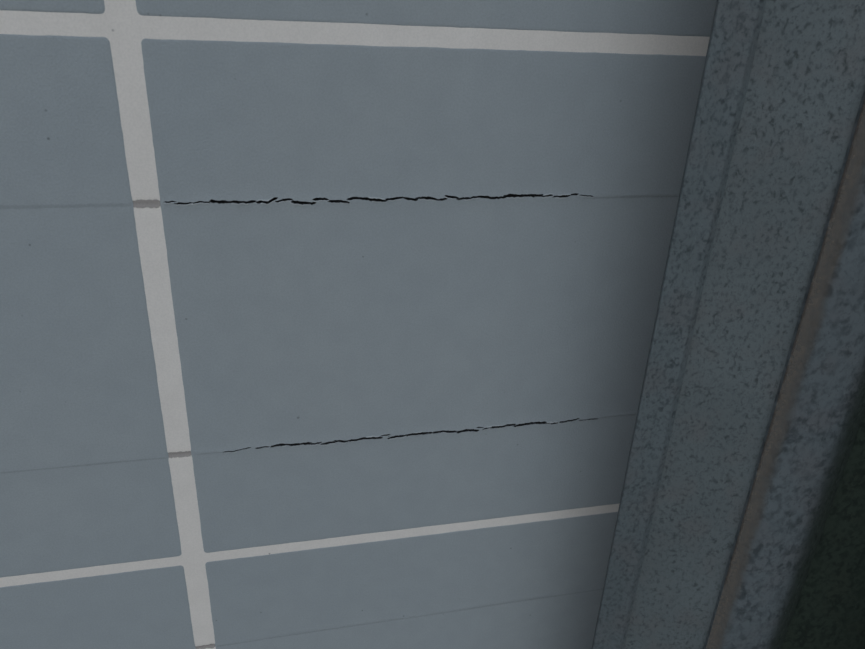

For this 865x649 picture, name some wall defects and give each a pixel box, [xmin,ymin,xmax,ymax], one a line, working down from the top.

crack [163,193,593,206]
crack [224,418,596,453]